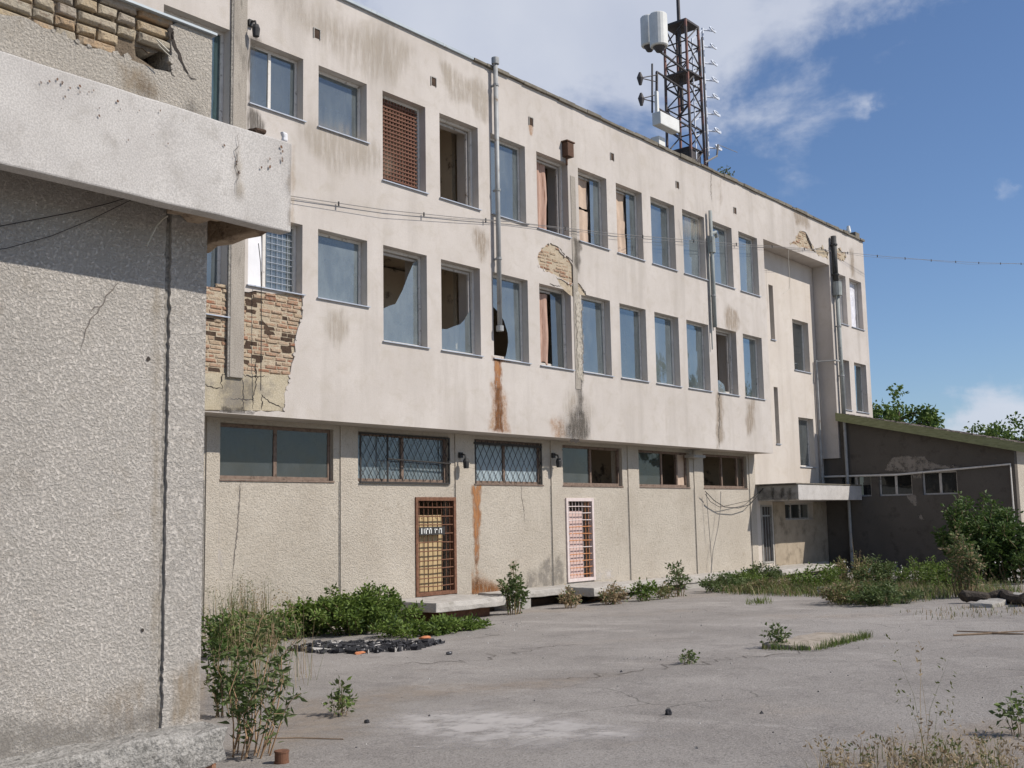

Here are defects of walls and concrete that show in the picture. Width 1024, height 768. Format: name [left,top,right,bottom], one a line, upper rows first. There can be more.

flaking render [0,0,176,76]
spalling [790,231,846,261]
crack [81,283,118,347]
flaking render [205,283,227,373]
flaking render [244,291,304,412]
flaking render [538,242,586,381]
rust [494,359,505,431]
damp [568,380,588,443]
rust [473,485,481,564]
rust [472,581,499,594]